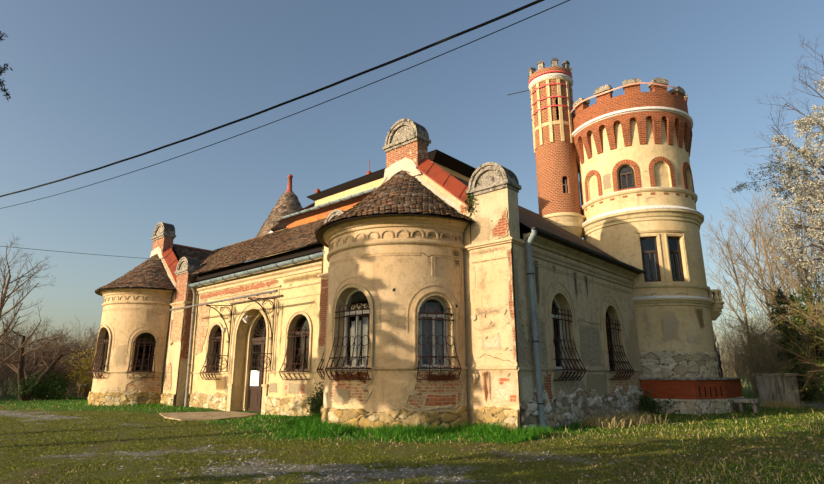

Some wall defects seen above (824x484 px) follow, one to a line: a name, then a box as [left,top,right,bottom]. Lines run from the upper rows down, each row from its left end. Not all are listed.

flaking render [100,279,278,393]
flaking render [282,277,329,397]
flaking render [323,370,372,408]
flaking render [380,204,554,411]